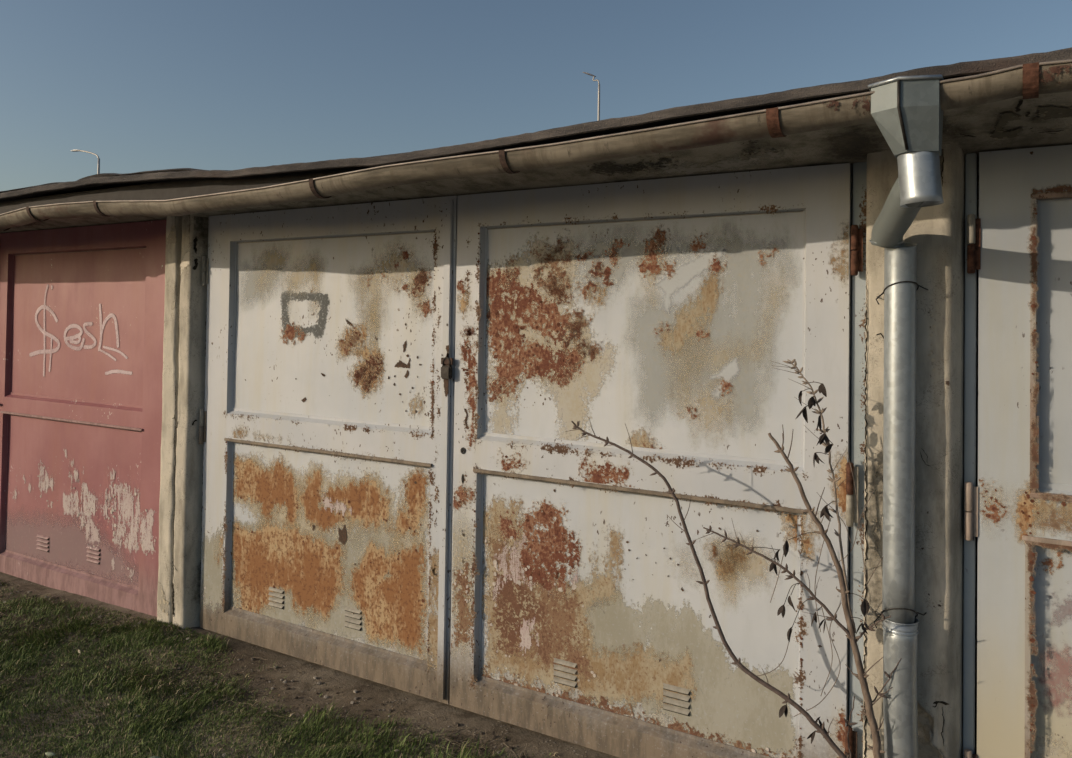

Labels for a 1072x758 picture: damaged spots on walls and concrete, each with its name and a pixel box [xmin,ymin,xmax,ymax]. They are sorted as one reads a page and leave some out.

rust [338,248,432,397]
rust [442,236,629,450]
rust [637,228,676,286]
rust [654,258,726,364]
rust [1028,207,1039,315]
rust [628,429,662,449]
peeling [7,447,158,582]
rust [214,453,439,669]
rust [453,486,697,708]
rust [709,543,767,590]
rust [979,329,1072,753]
spalling [917,700,945,758]